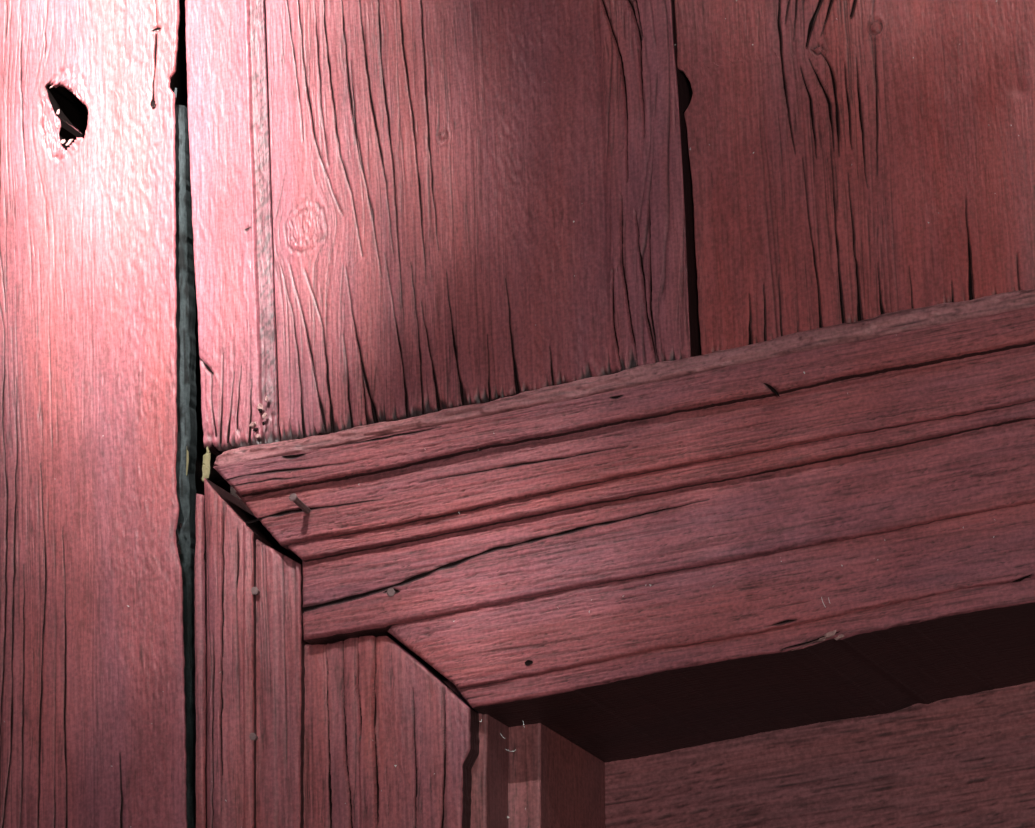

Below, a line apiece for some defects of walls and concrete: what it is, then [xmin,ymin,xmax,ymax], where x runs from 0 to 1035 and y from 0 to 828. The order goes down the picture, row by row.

crack [602,0,645,128]
crack [777,0,884,328]
crack [117,768,125,828]